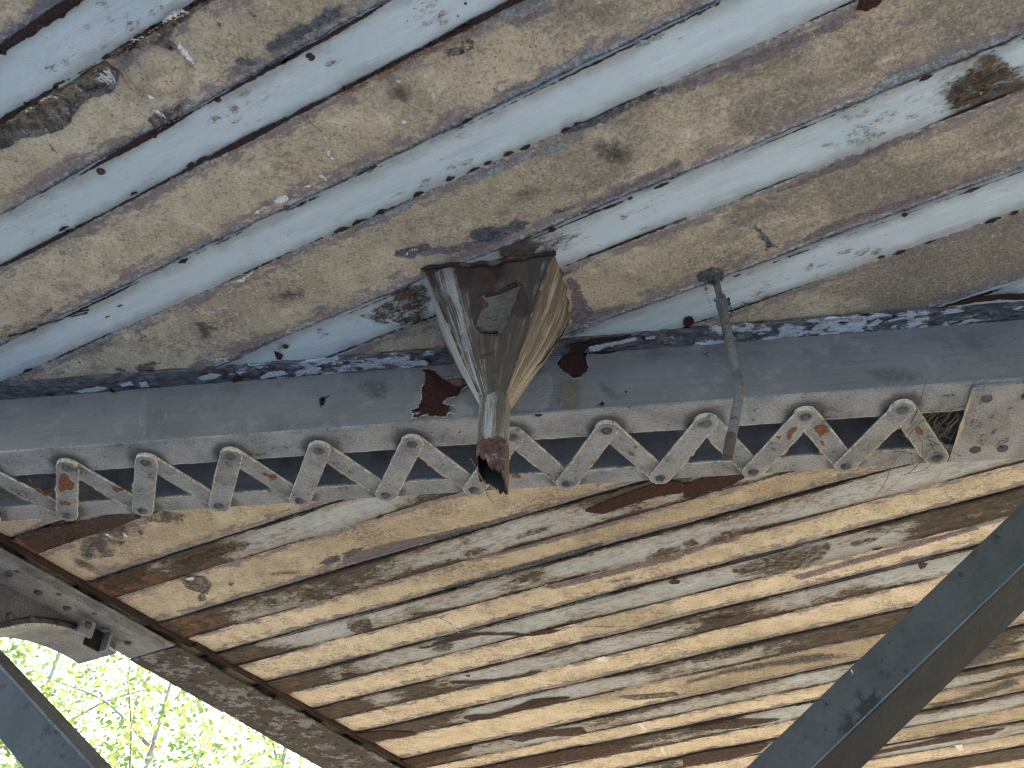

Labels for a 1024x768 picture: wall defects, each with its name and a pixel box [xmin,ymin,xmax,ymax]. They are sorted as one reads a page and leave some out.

spalling [0,0,216,149]
rust [431,2,720,142]
rust [0,0,531,283]
rust [773,242,906,263]
rust [1,274,154,337]
rust [681,282,812,329]
peeling [198,373,221,381]
peeling [260,367,322,379]
rust [464,471,795,557]
rust [542,460,1024,567]
rust [0,488,1024,768]
spalling [620,692,679,700]